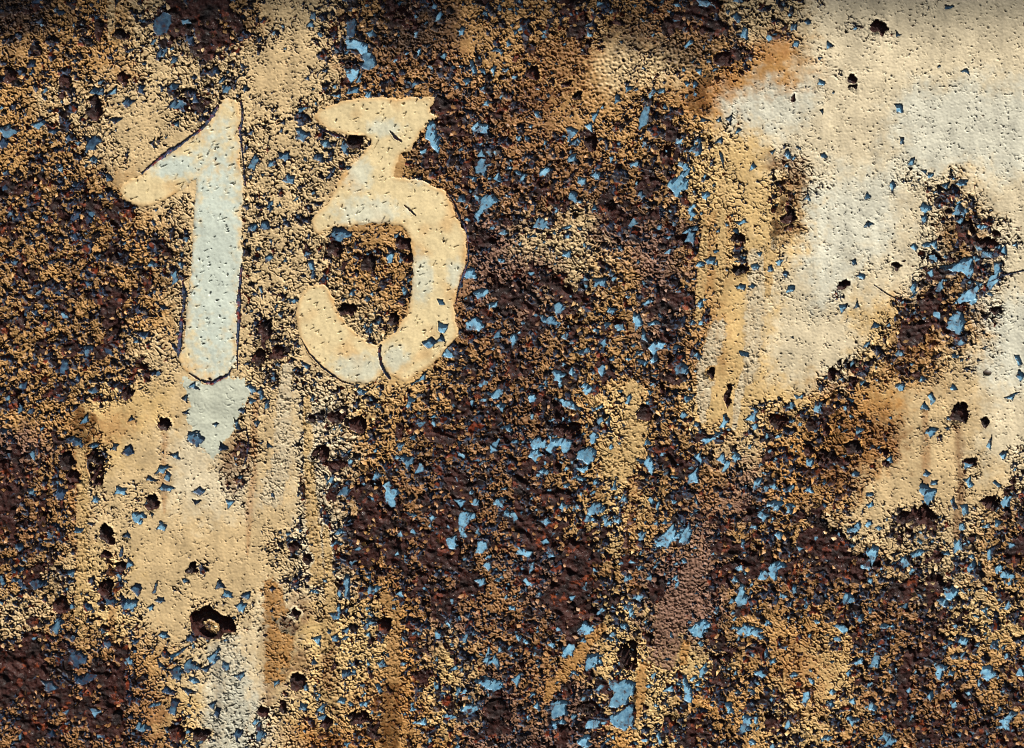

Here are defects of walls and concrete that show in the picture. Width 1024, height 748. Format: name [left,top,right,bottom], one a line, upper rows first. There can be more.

rust [0,431,76,594]
rust [0,616,143,748]
rust [0,162,176,373]
peeling [0,0,285,748]
rust [420,95,520,250]
rust [321,258,672,671]
rust [583,663,649,719]
peeling [215,0,1024,748]
rust [596,104,698,255]
rust [637,278,696,401]
rust [646,436,881,697]
rust [826,507,1024,748]